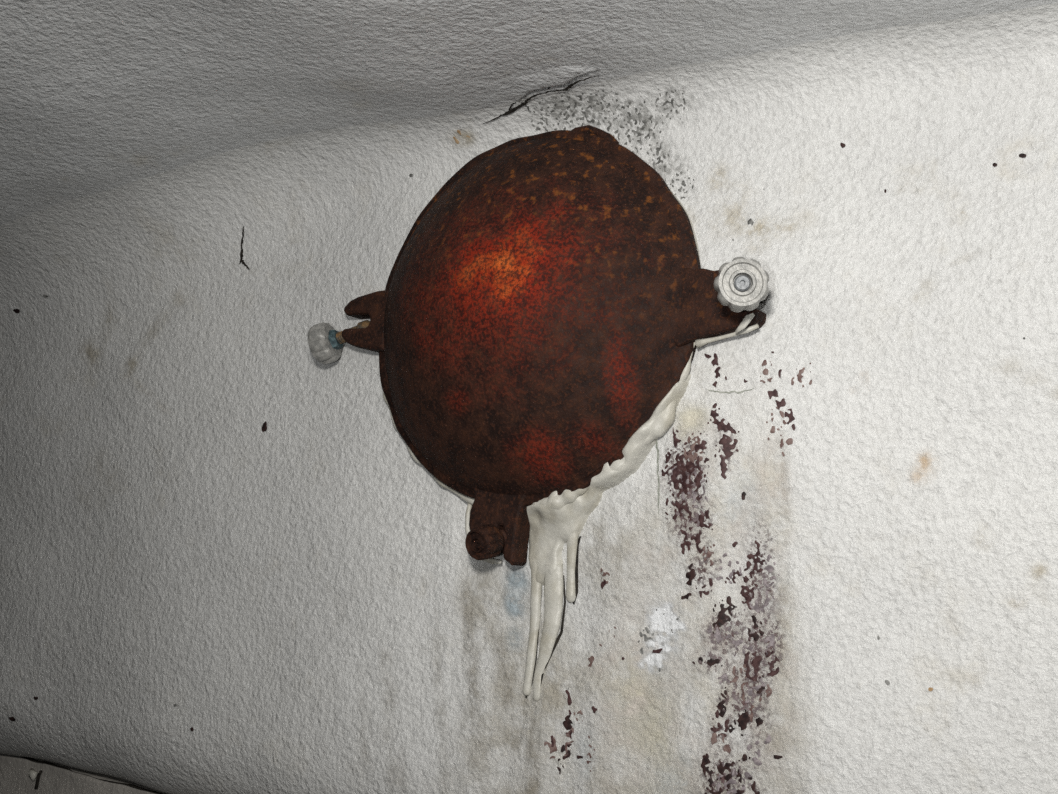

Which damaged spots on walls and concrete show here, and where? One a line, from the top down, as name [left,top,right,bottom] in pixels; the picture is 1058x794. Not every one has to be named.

crack [483,66,600,124]
leakage [529,88,694,199]